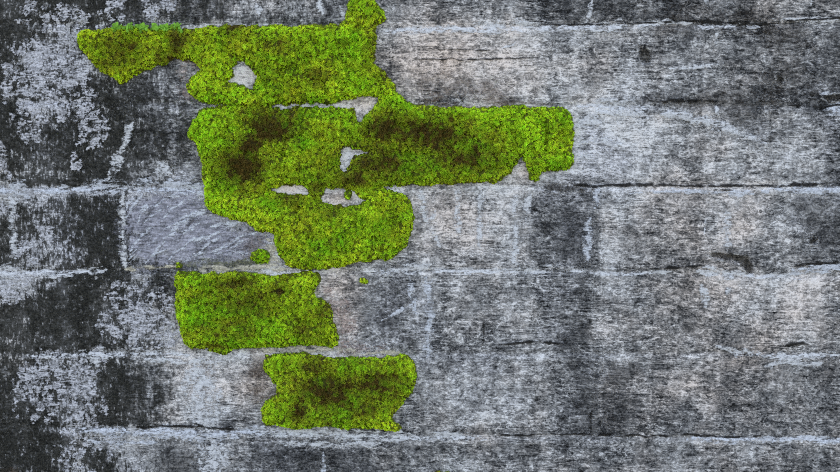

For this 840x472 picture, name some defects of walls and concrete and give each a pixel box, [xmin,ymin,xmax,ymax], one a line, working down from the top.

leakage [31,347,487,472]